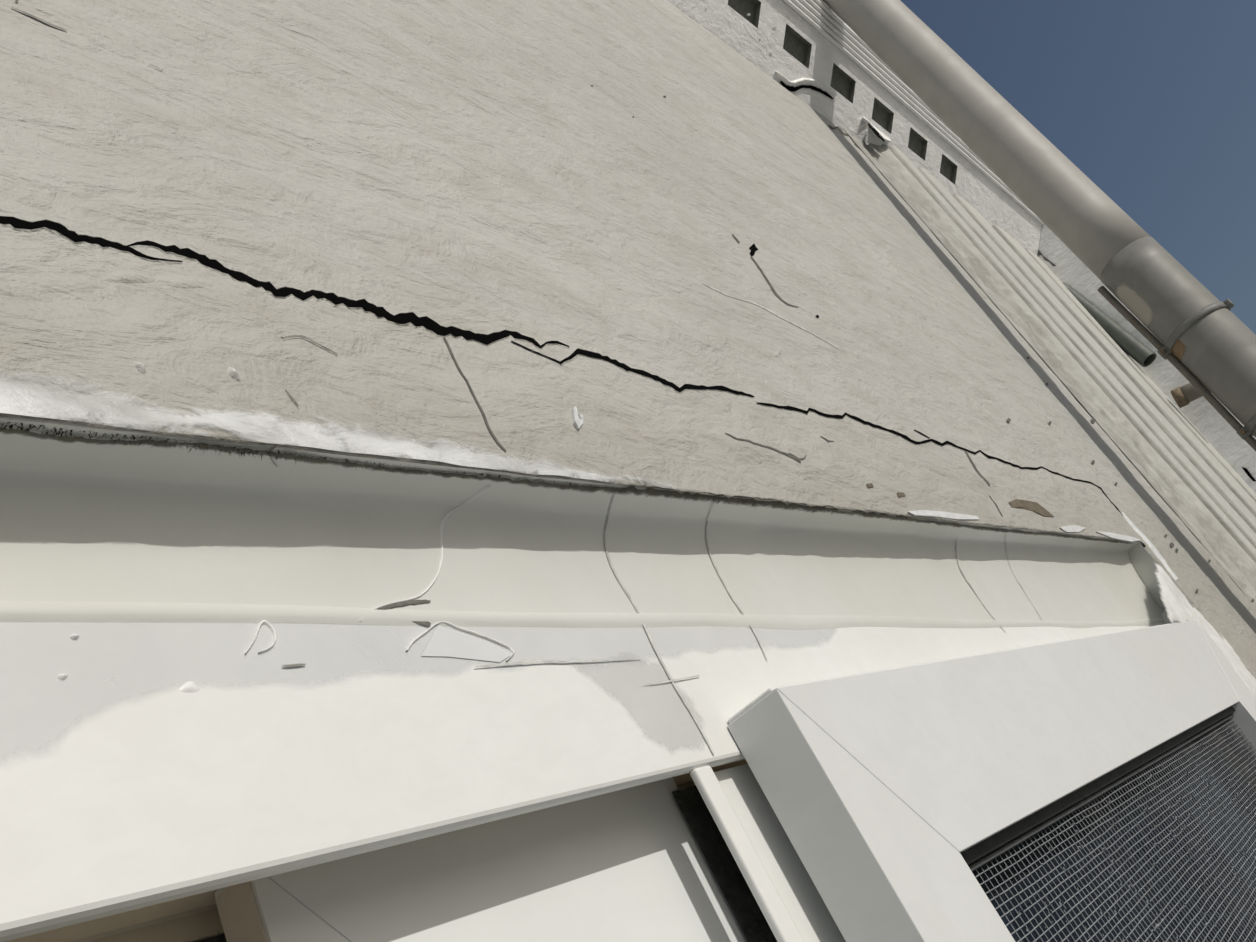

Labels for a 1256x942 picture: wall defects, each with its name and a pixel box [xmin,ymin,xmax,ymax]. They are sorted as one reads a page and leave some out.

crack [828,117,891,148]
peeling [0,373,675,489]
crack [0,214,1123,632]
peeling [360,485,490,621]
peeling [405,621,515,662]
crack [604,492,715,755]
crack [706,501,768,660]